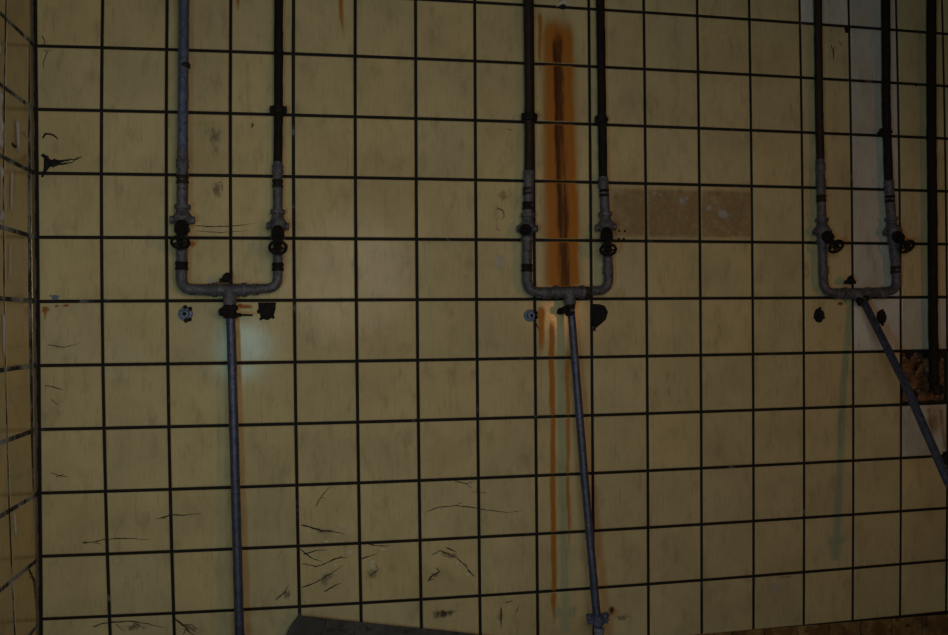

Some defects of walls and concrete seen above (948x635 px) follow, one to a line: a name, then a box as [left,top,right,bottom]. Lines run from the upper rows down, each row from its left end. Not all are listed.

corrosion [538,15,579,286]
corrosion [538,308,570,613]